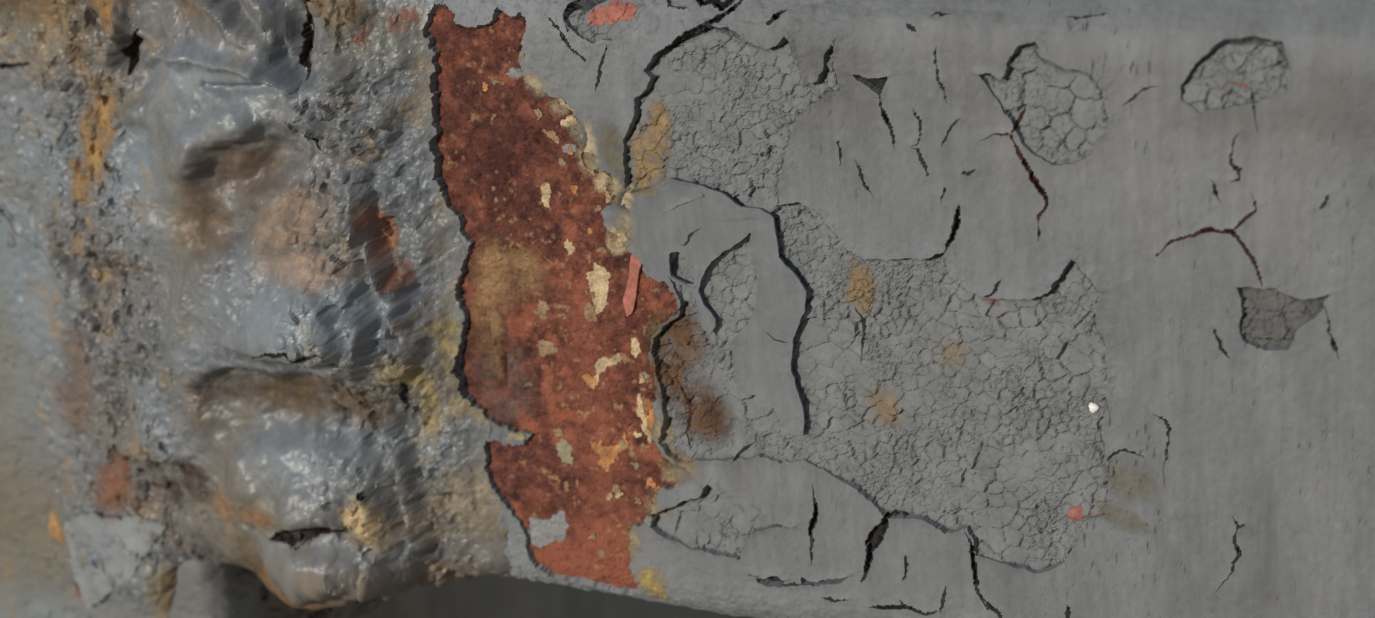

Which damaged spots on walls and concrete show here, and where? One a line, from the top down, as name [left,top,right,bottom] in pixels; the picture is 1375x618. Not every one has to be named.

peeling [1182,40,1289,113]
crack [837,141,875,198]
crack [879,12,1048,254]
crack [1156,81,1262,286]
rust [359,211,398,251]
rust [400,7,724,599]
peeling [612,27,1110,570]
peeling [1240,287,1328,347]
rust [227,365,440,430]
rust [343,504,380,540]
crack [750,486,1002,618]
crack [1216,515,1244,592]